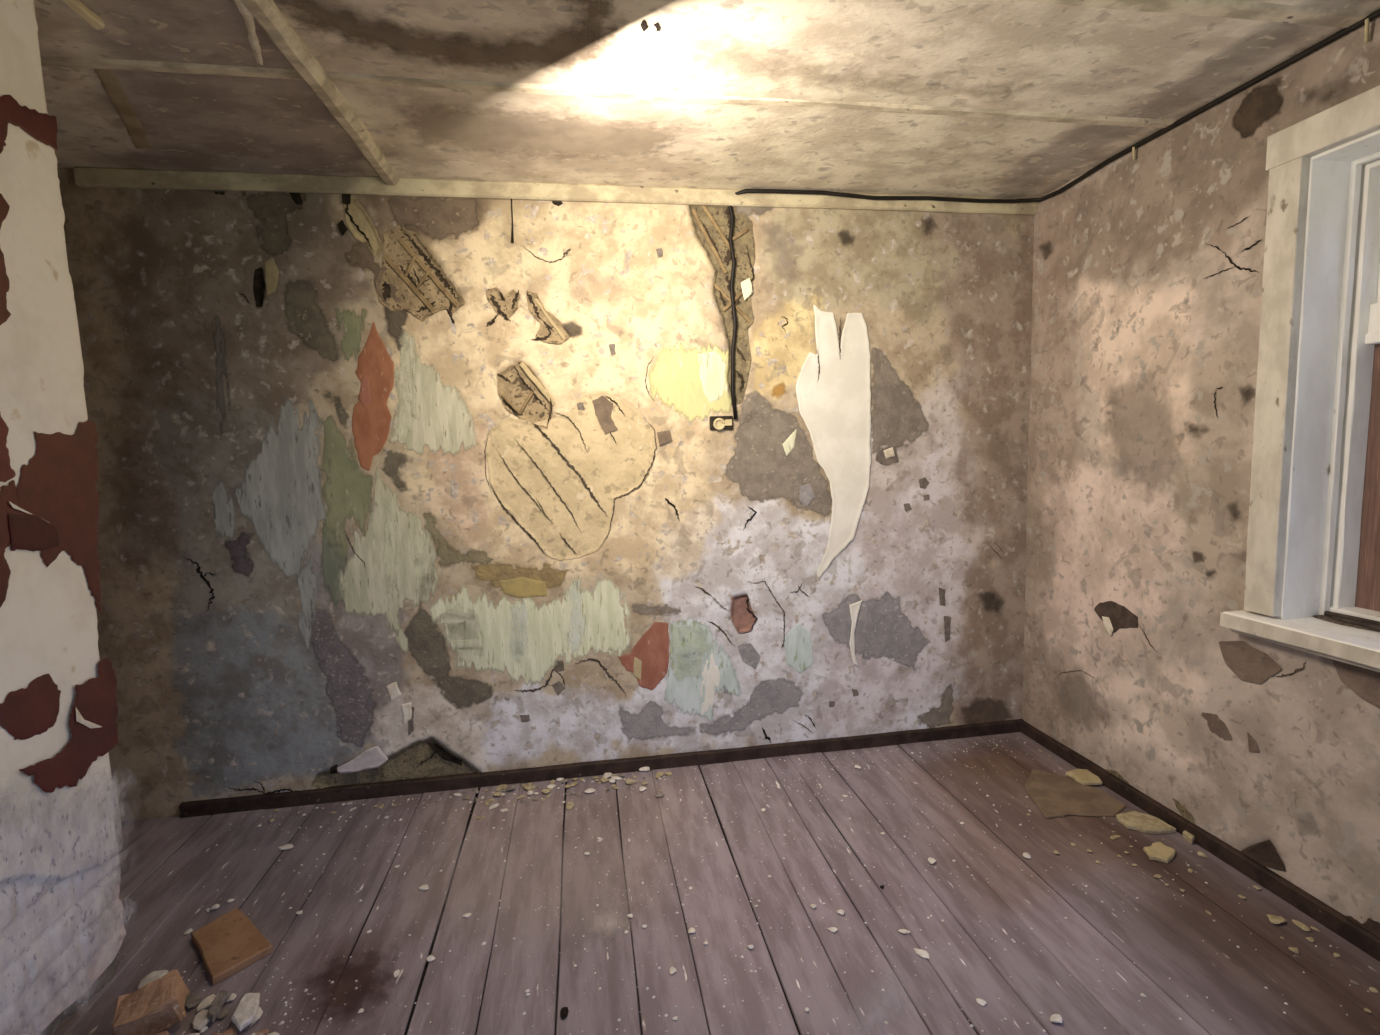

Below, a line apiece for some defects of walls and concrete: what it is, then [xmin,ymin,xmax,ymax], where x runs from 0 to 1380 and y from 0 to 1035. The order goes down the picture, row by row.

damp [277,0,608,69]
damp [641,20,661,32]
peeling [0,95,58,154]
flaking render [1233,79,1283,138]
crack [1206,216,1262,278]
peeling [0,248,11,325]
peeling [649,205,930,578]
peeling [0,414,101,614]
flaking render [195,190,802,789]
flaking render [823,588,951,668]
flaking render [1094,601,1157,652]
peeling [0,657,118,793]